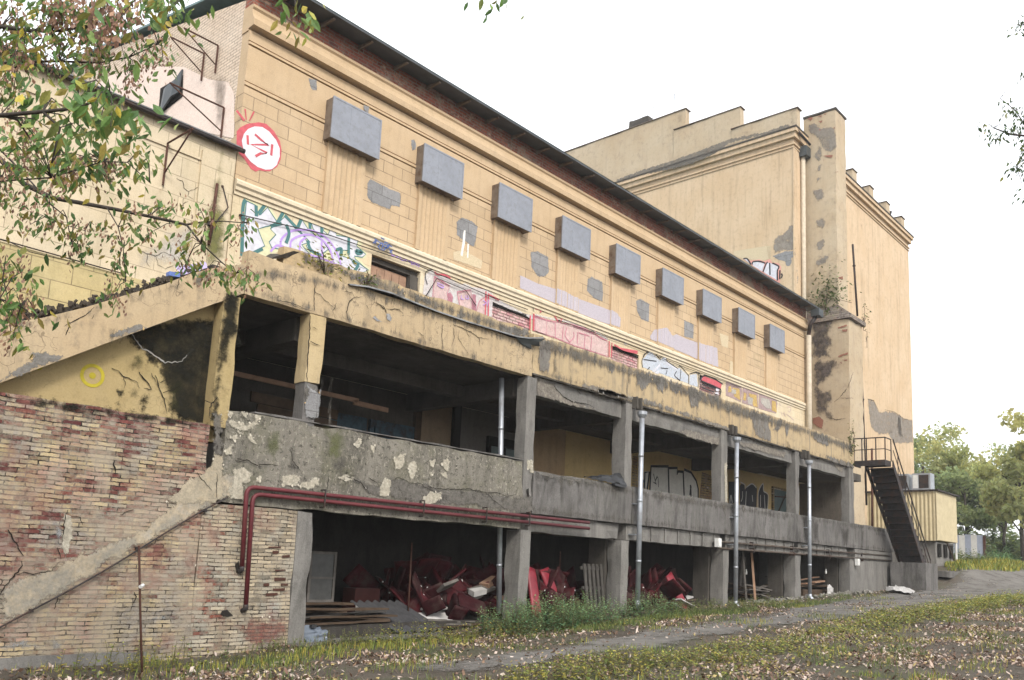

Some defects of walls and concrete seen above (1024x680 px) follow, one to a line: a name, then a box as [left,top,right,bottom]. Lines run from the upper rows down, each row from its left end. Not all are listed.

flaking render [808,113,837,199]
flaking render [773,226,793,253]
damp [30,292,242,436]
crack [112,334,187,411]
damp [545,339,852,465]
damp [812,320,837,418]
flaking render [868,400,913,443]
peeling [281,474,319,490]
flaking render [245,616,285,644]